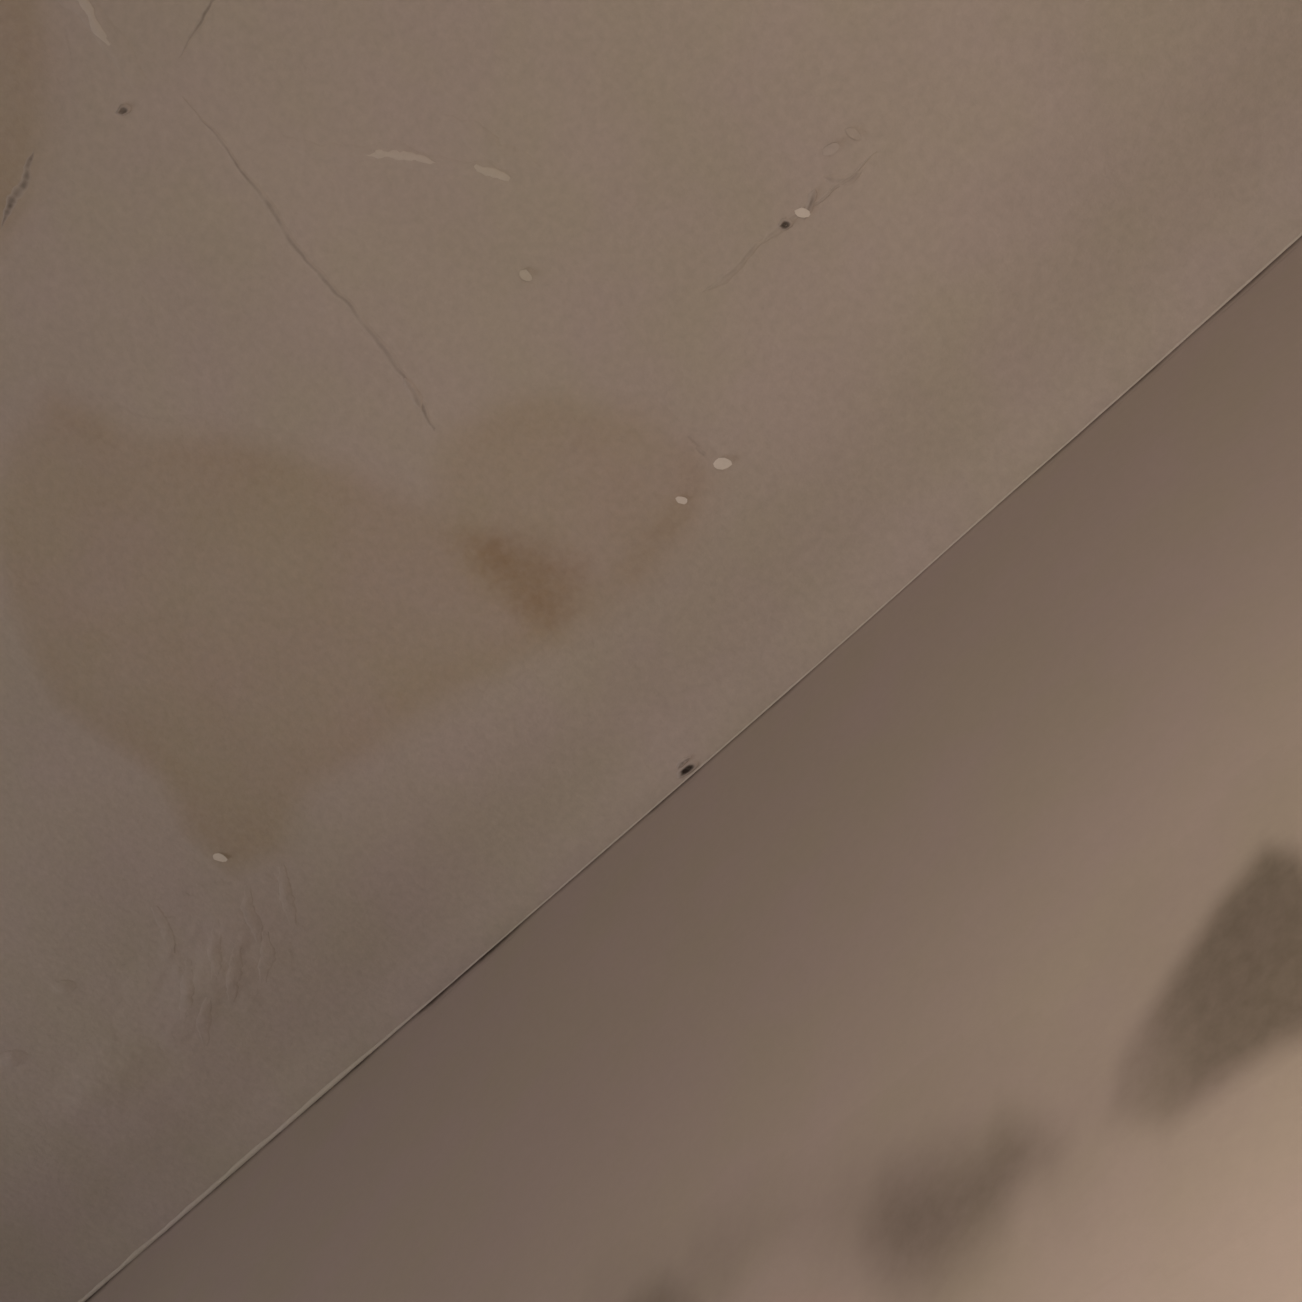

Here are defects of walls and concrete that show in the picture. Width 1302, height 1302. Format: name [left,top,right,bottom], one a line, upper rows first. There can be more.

crack [0,149,34,232]
damp [0,0,73,267]
crack [703,128,876,292]
damp [0,378,733,884]
crack [78,232,1302,1302]